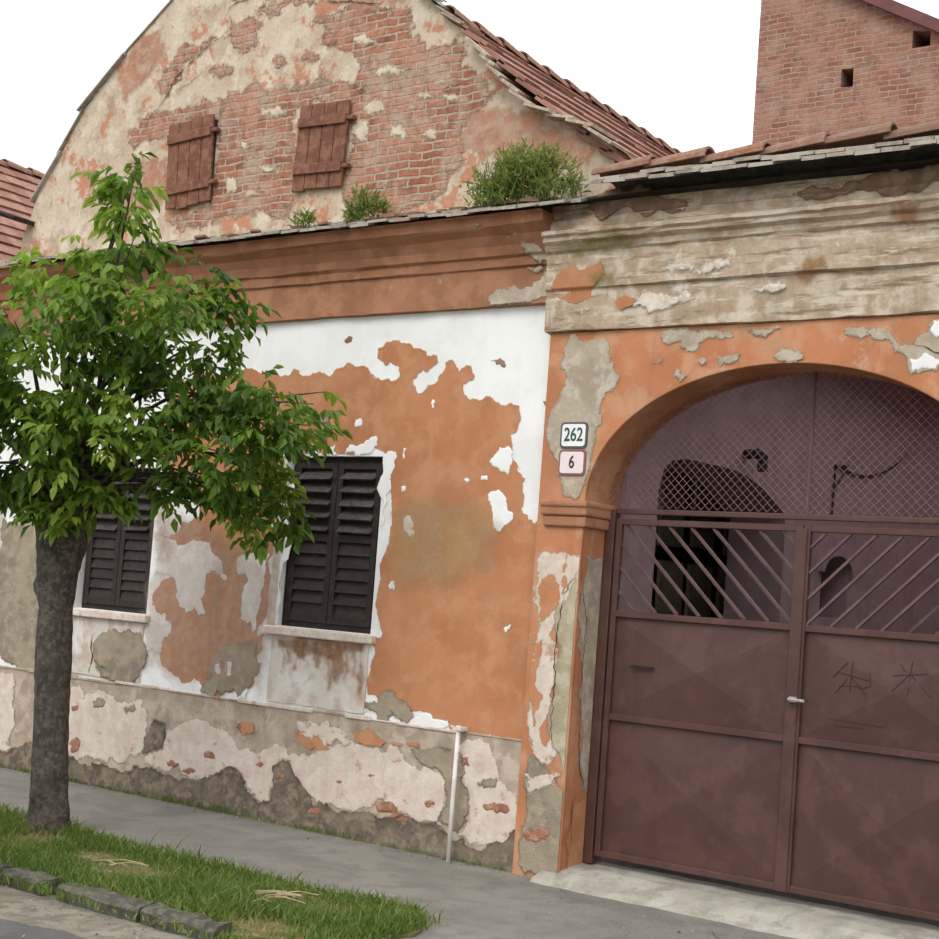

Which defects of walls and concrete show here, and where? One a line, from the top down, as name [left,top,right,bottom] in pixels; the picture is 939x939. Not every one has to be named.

crack [329,0,383,8]
crack [149,0,244,118]
spalling [122,0,595,240]
spalling [793,164,939,200]
peeling [663,258,731,275]
peeling [615,290,695,313]
peeling [752,281,786,293]
spalling [660,327,741,365]
spalling [773,348,804,363]
flaking render [543,334,620,500]
peeling [68,340,603,875]
spalling [0,518,39,772]